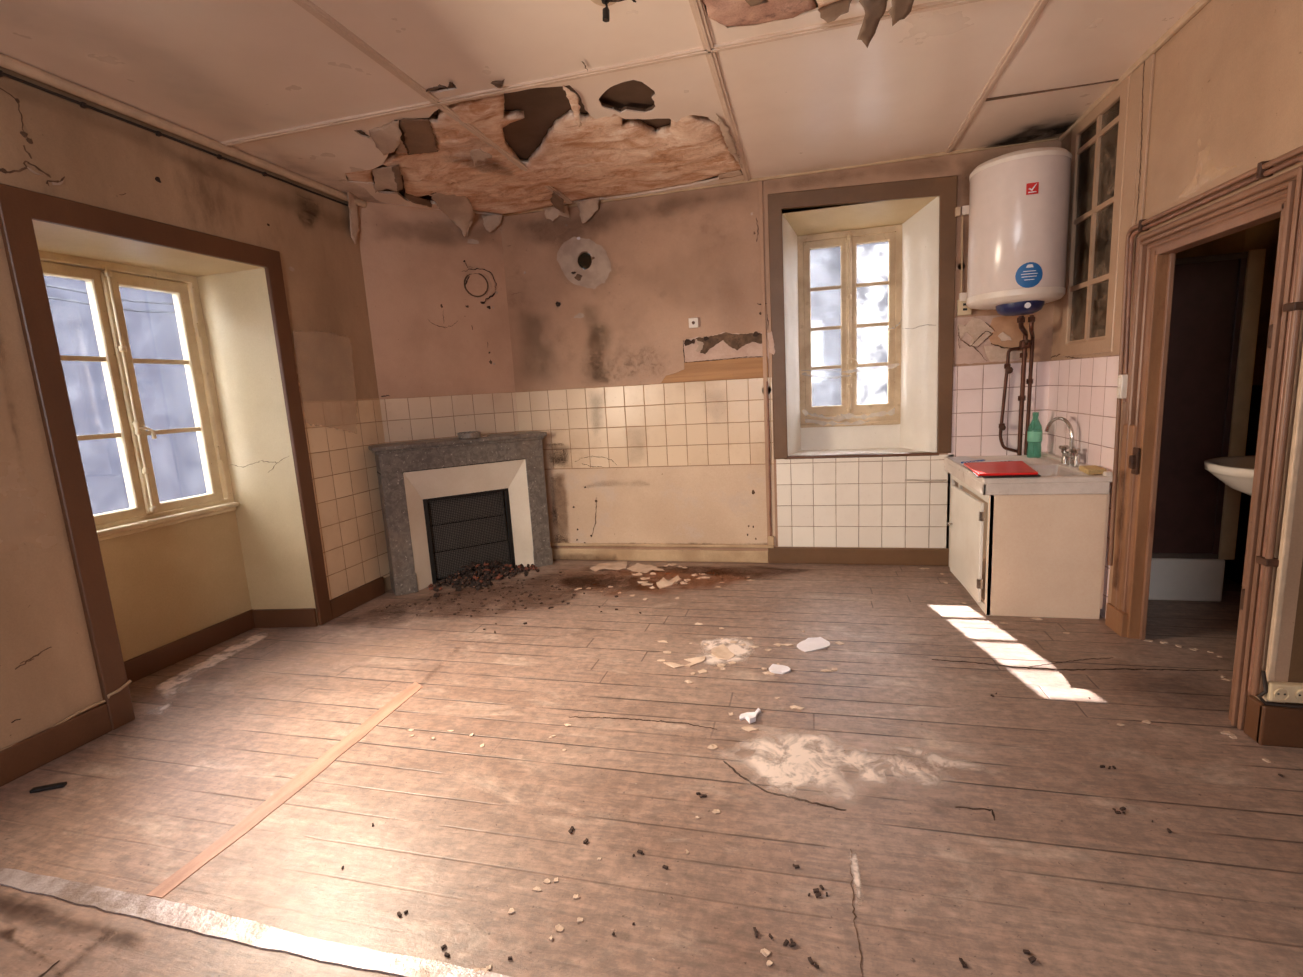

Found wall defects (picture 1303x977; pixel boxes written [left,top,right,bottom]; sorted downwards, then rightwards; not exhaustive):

crack [0,88,65,186]
flaking render [683,331,769,363]